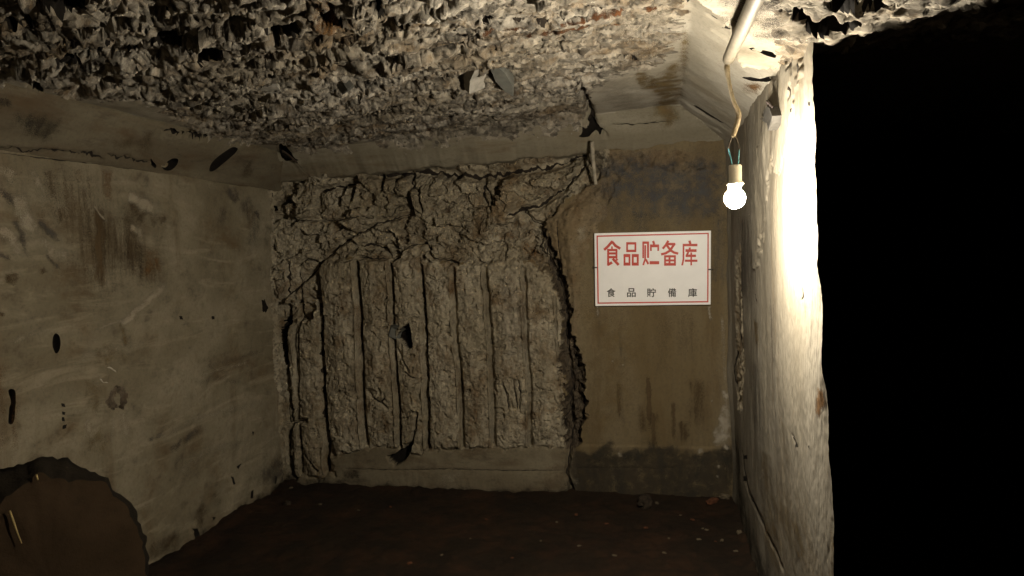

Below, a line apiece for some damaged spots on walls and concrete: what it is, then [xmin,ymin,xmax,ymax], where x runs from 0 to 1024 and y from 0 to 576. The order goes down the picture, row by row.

crack [2,146,148,165]
spalling [0,0,693,159]
crack [284,155,587,489]
spalling [262,149,612,484]
water stain [414,271,825,576]